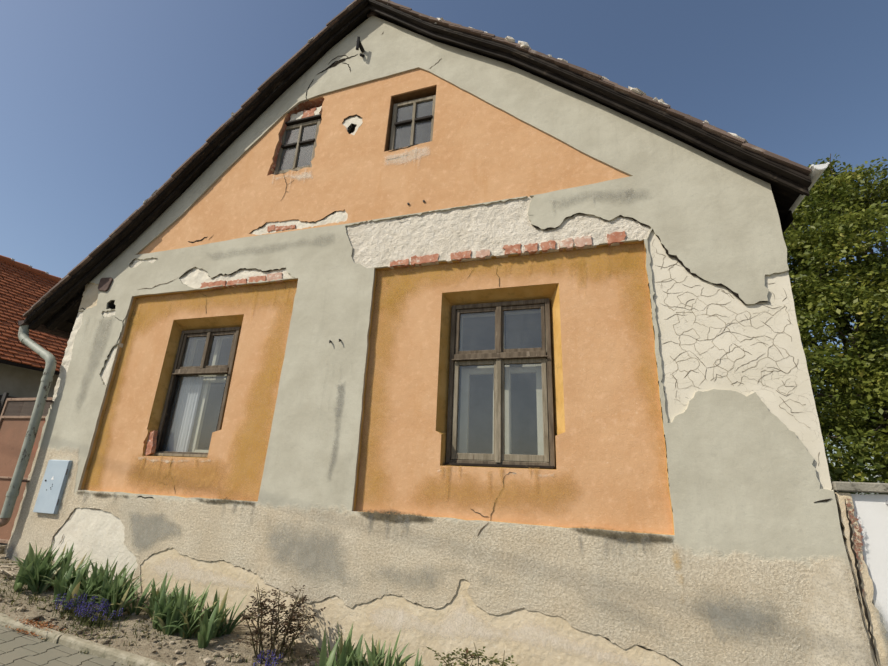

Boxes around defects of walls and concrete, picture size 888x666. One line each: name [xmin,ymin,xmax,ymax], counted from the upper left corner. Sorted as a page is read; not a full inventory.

crack [306,55,356,99]
spalling [285,106,323,126]
flaking render [180,267,291,290]
flaking render [101,335,124,385]
flaking render [250,197,832,490]
crack [533,213,810,487]
flaking render [51,507,681,666]